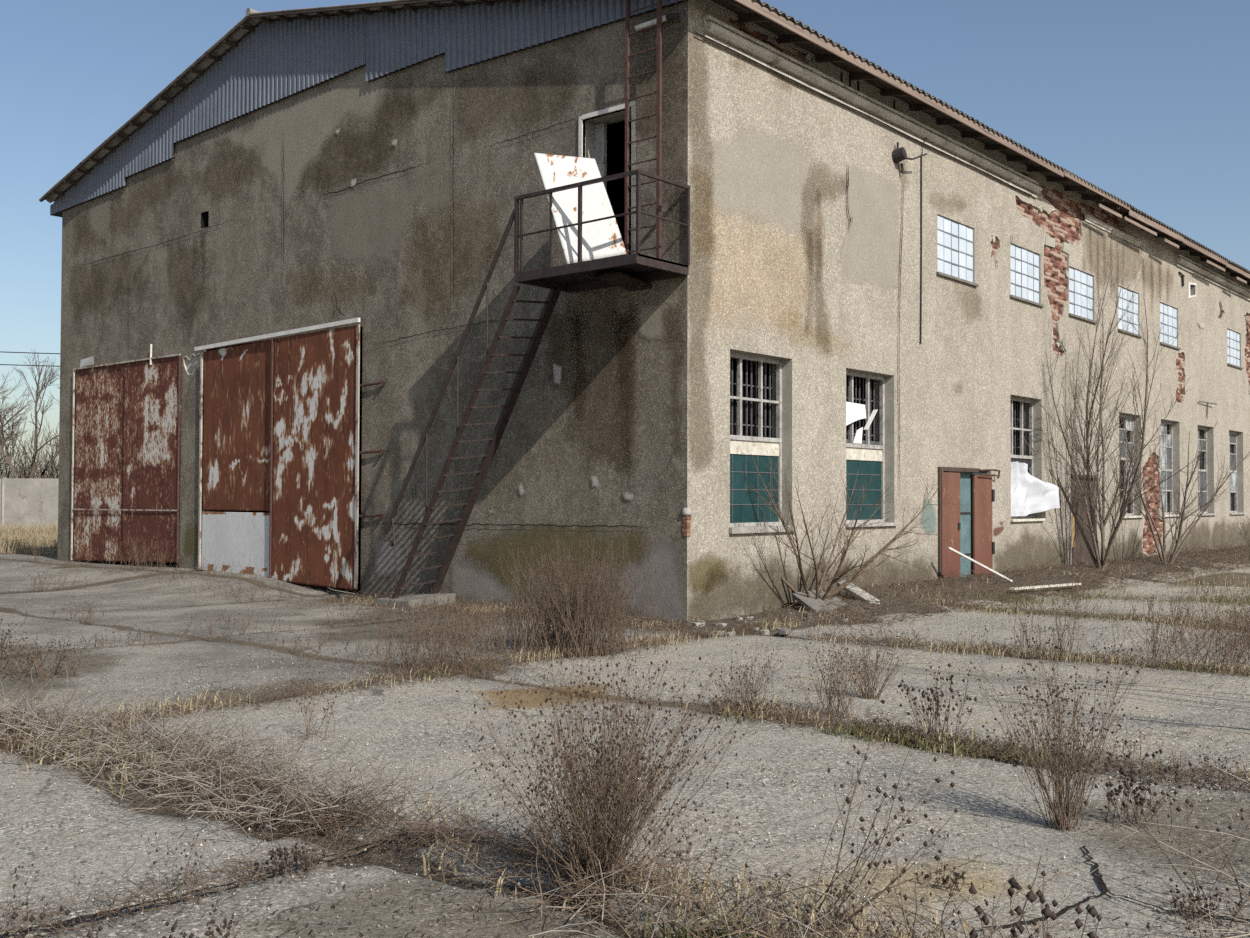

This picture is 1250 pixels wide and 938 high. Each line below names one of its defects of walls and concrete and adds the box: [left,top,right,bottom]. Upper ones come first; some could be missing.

spalling [1014,171,1126,357]
spalling [1142,450,1163,556]